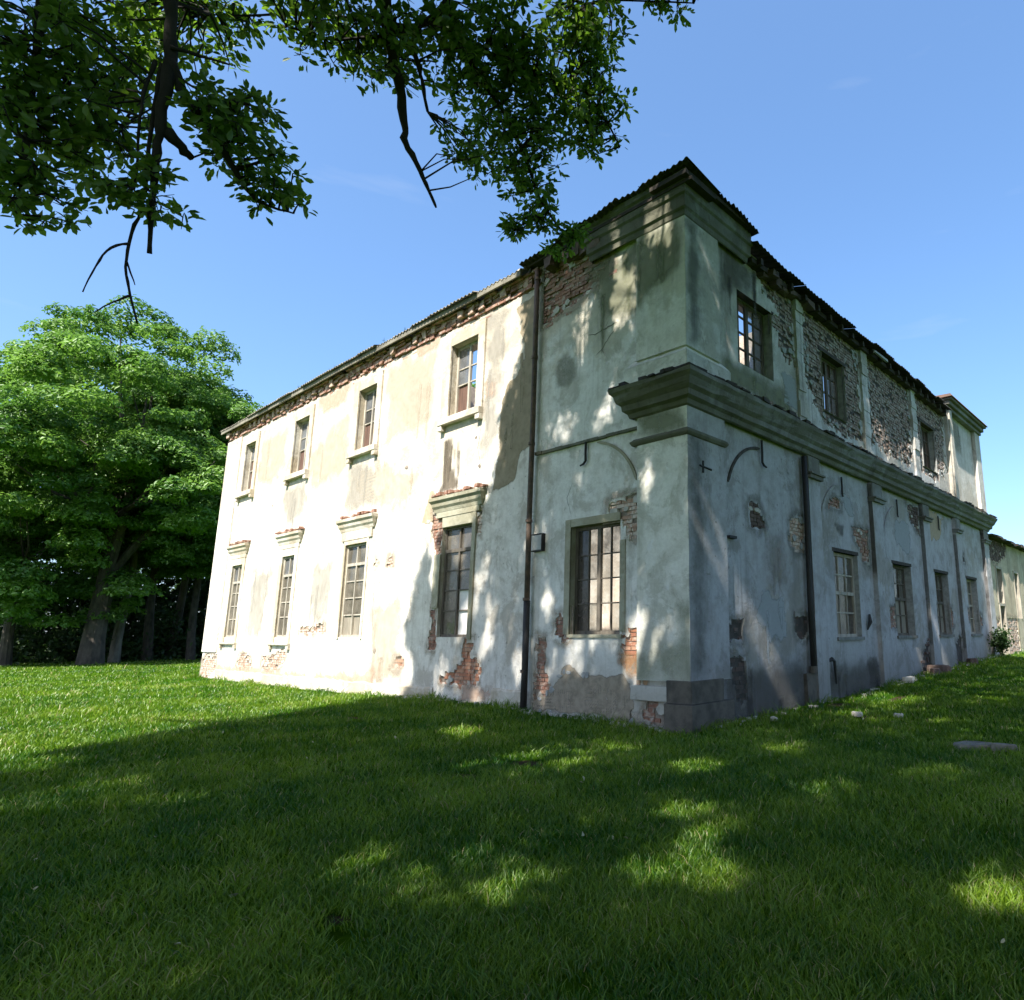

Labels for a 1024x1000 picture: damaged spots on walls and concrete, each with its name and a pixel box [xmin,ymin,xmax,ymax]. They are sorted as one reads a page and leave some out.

flaking render [254,240,617,431]
water stain [558,358,573,385]
flaking render [756,268,946,481]
flaking render [603,490,637,544]
flaking render [746,498,766,529]
flaking render [788,514,805,555]
peeling [907,505,943,540]
flaking render [428,605,440,652]
flaking render [200,652,217,678]
flaking render [235,649,287,673]
flaking render [438,637,482,690]
flaking render [532,606,664,729]